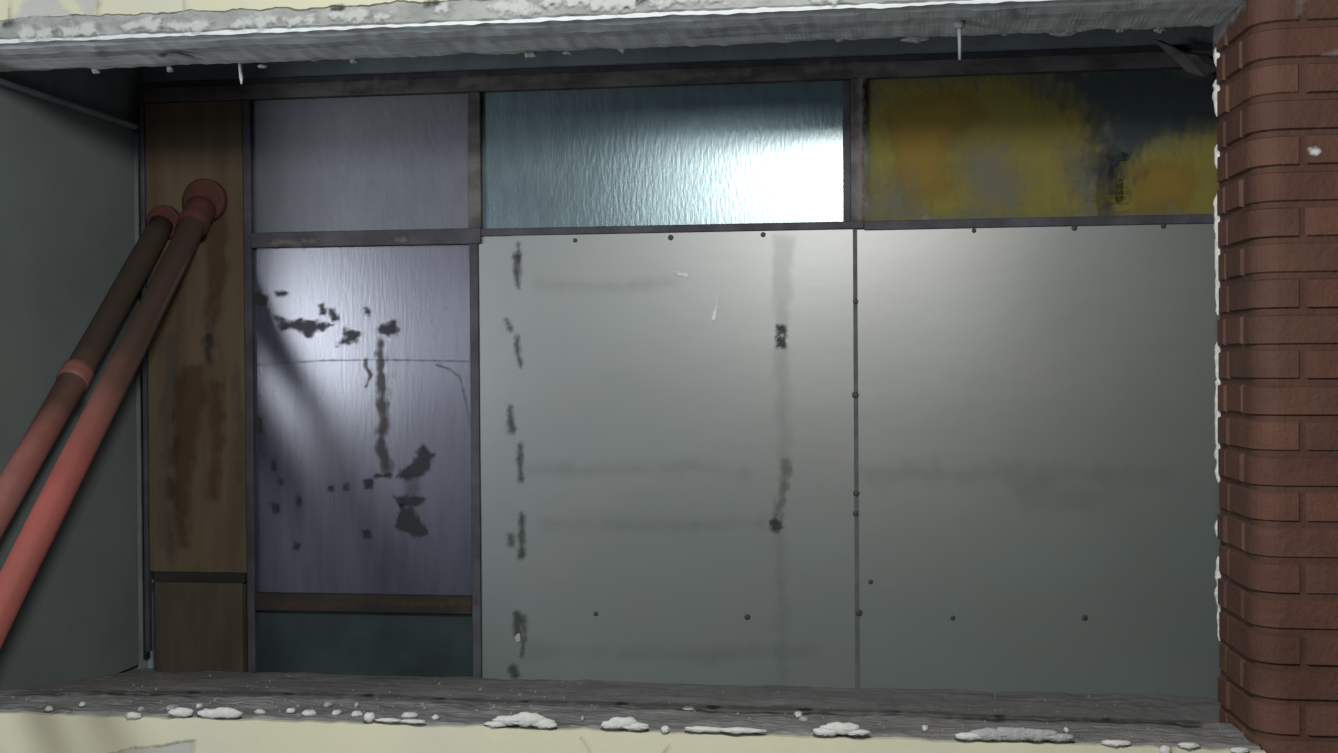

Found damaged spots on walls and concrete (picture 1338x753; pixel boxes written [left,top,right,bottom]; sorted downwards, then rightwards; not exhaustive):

peeling [254,291,360,344]
peeling [378,320,399,335]
peeling [397,445,434,479]
peeling [328,479,373,491]
peeling [395,497,427,537]